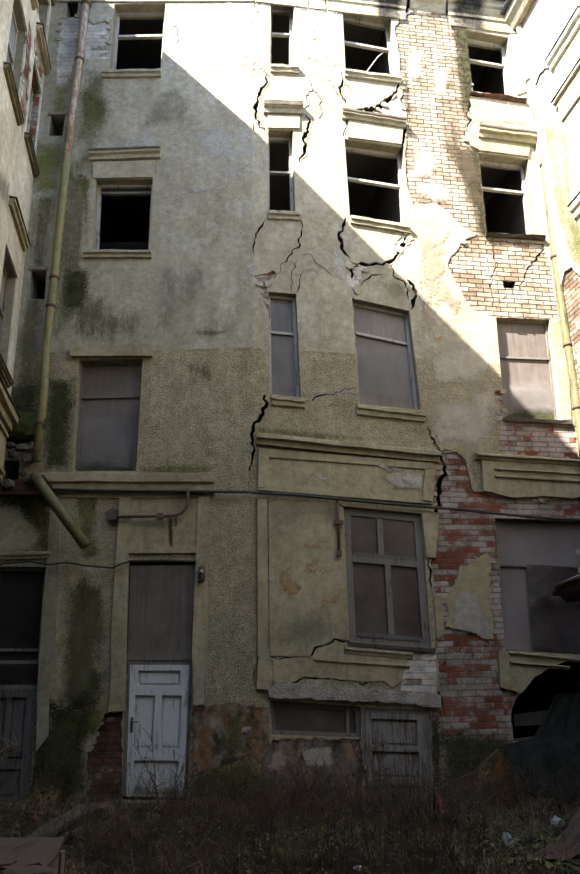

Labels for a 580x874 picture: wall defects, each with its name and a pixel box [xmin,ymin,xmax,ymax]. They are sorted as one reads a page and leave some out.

flaking render [20,25,44,134]
flaking render [56,13,113,84]
water stain [78,76,105,147]
crack [251,68,270,134]
crack [298,71,403,162]
crack [273,216,420,310]
water stain [11,300,76,470]
water stain [78,461,133,471]
crack [248,396,268,484]
flaking render [375,10,580,784]
water stain [64,577,105,727]
flaking render [81,711,123,804]